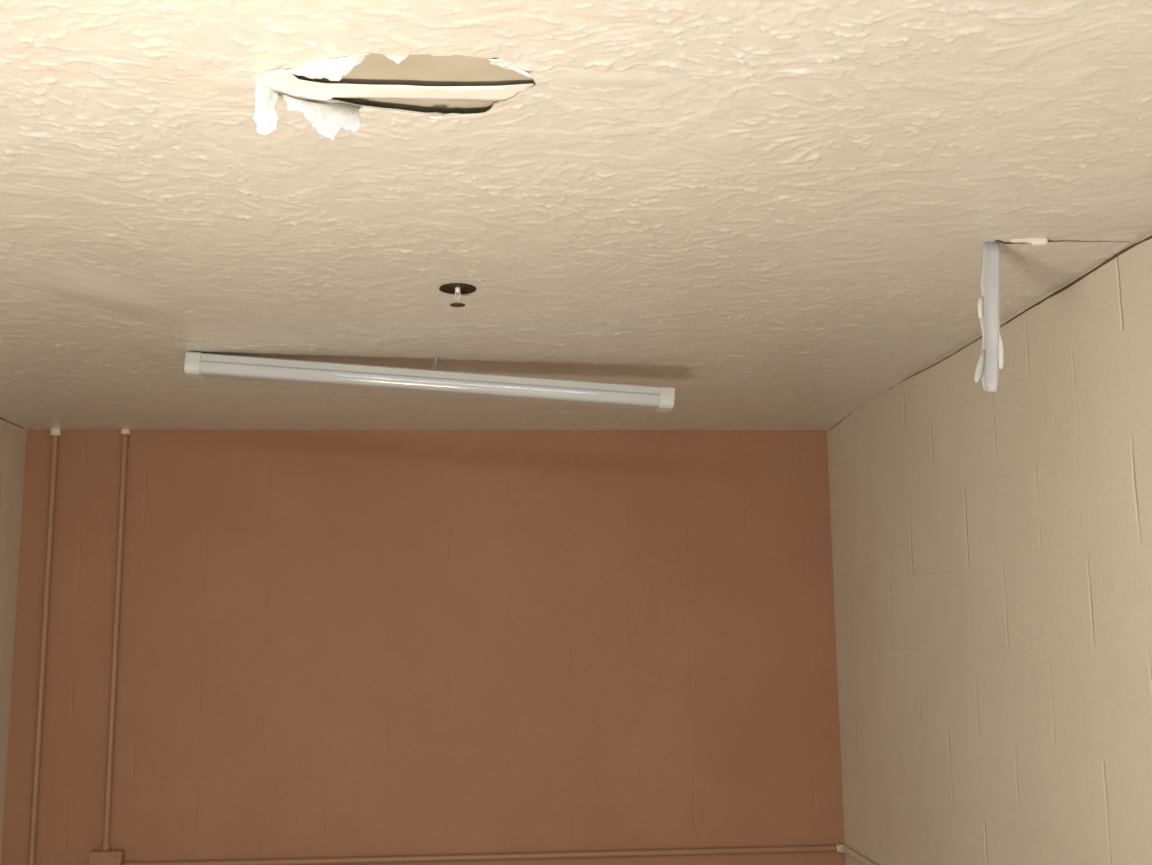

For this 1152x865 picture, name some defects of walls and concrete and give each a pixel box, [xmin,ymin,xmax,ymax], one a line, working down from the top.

peeling [200,53,670,140]
peeling [974,242,1005,392]